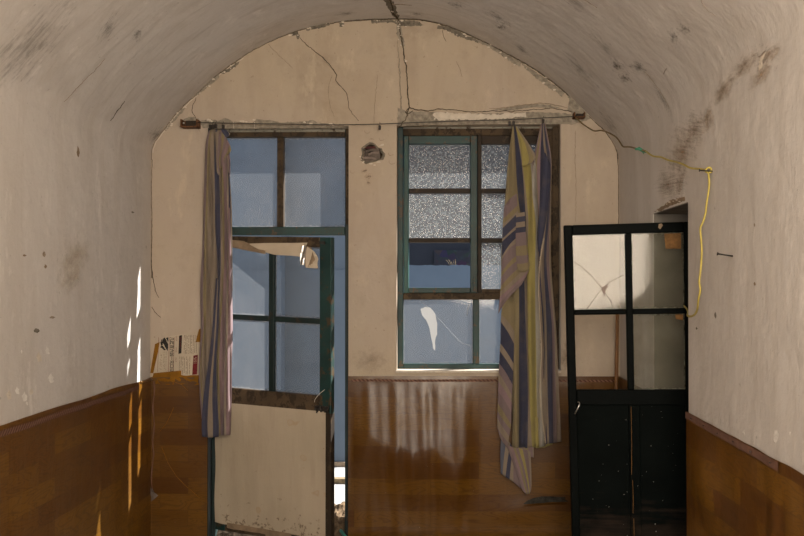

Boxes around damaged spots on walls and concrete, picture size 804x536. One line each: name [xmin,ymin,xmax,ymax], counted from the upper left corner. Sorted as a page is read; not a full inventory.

flaking render [397,24,595,126]
spalling [359,139,395,166]
crack [151,0,619,318]